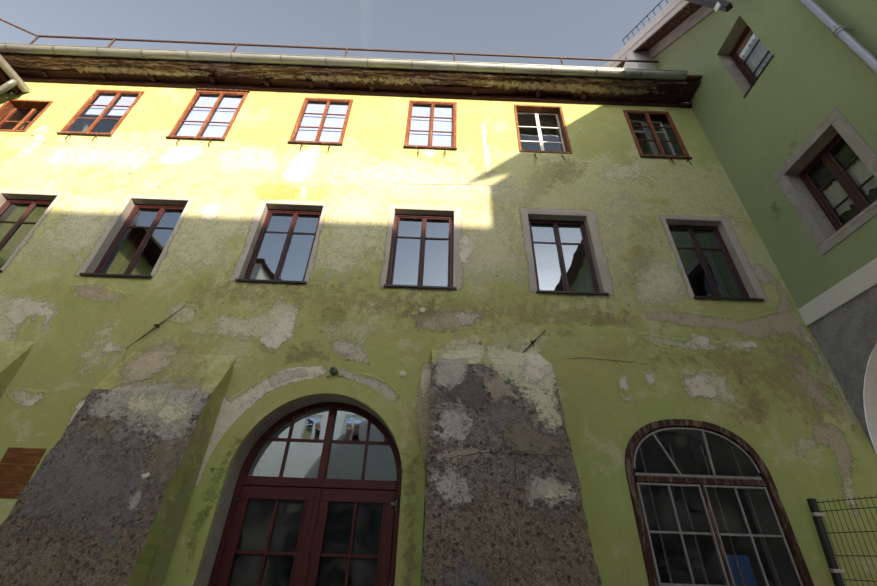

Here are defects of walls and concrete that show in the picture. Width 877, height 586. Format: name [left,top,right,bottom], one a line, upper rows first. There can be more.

peeling [74,65,212,77]
peeling [306,74,445,87]
peeling [469,79,666,96]
peeling [13,122,283,276]
spalling [0,292,65,342]
spalling [191,296,302,354]
spalling [636,332,759,353]
peeling [66,310,209,451]
flaking render [194,336,402,489]
peeling [406,310,565,518]
spalling [678,369,740,408]
peeling [521,472,581,511]